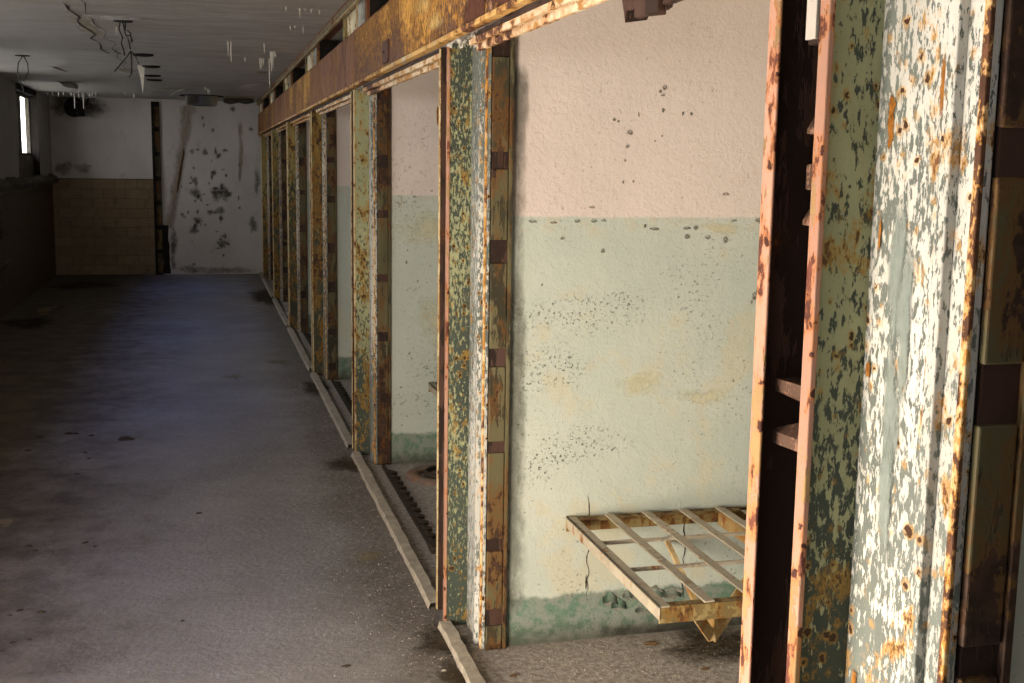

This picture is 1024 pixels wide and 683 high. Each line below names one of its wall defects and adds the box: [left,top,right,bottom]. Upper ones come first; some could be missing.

crack [62,0,126,68]
water stain [166,106,252,256]